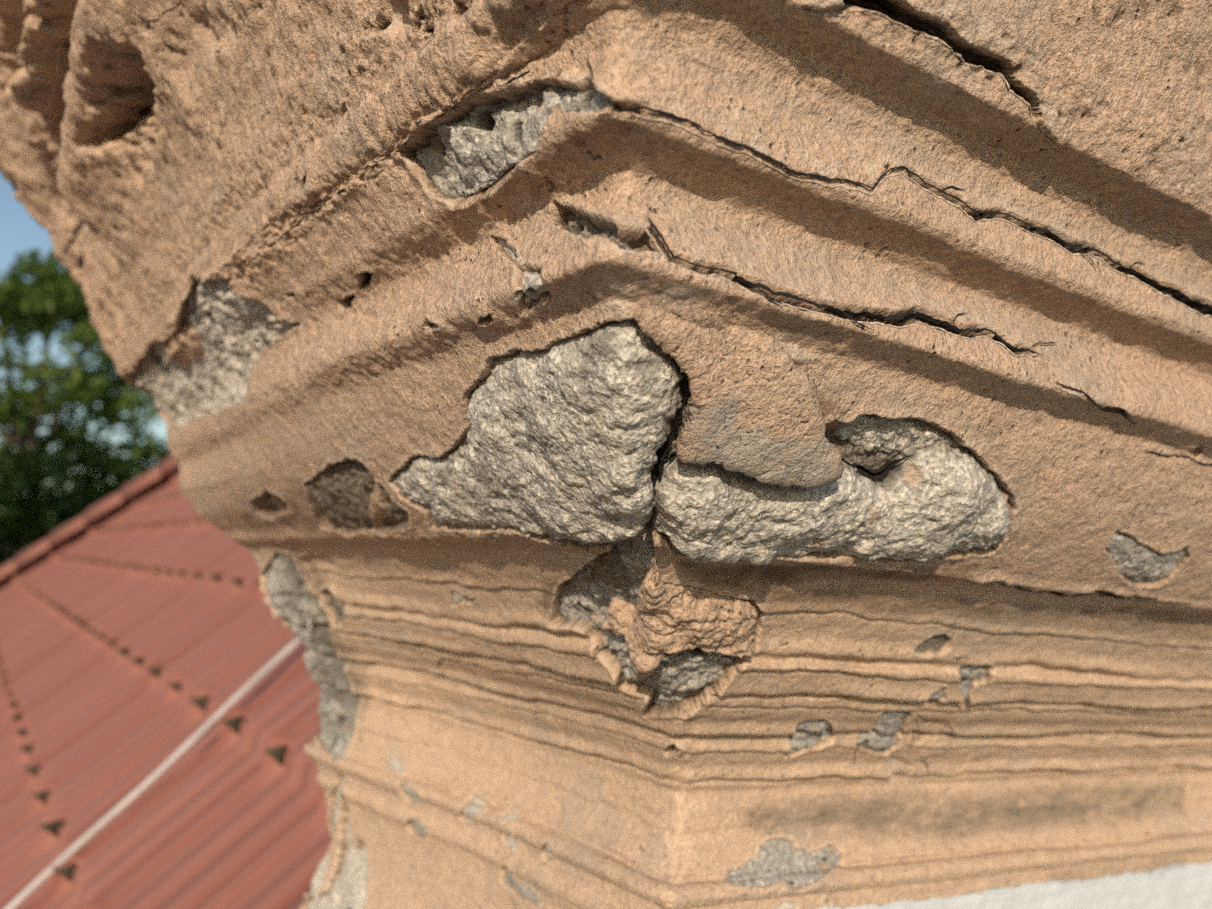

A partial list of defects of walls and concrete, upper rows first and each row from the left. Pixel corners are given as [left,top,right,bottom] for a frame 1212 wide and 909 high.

spalling [0,167,19,192]
spalling [415,86,614,198]
crack [616,106,1212,317]
crack [792,0,1064,158]
spalling [133,278,300,430]
spalling [306,319,1011,706]
spalling [1105,531,1185,585]
spalling [265,552,360,761]
spalling [784,719,831,754]
spalling [857,710,909,751]
spalling [308,777,369,909]
spalling [726,839,841,909]